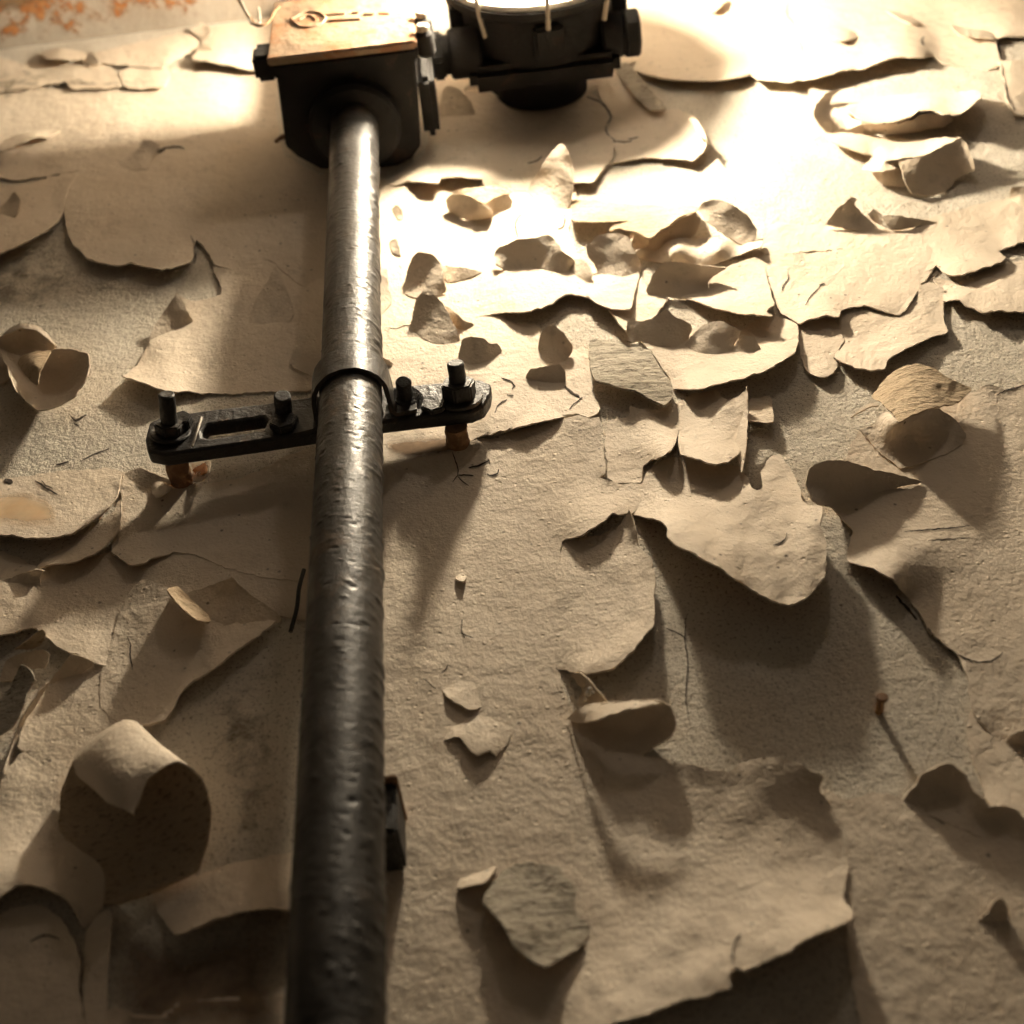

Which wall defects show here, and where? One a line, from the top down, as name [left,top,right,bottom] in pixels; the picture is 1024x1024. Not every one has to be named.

peeling [0,323,91,411]
rust [0,0,196,40]
peeling [0,17,329,395]
peeling [379,0,1024,1024]
peeling [0,447,316,1024]